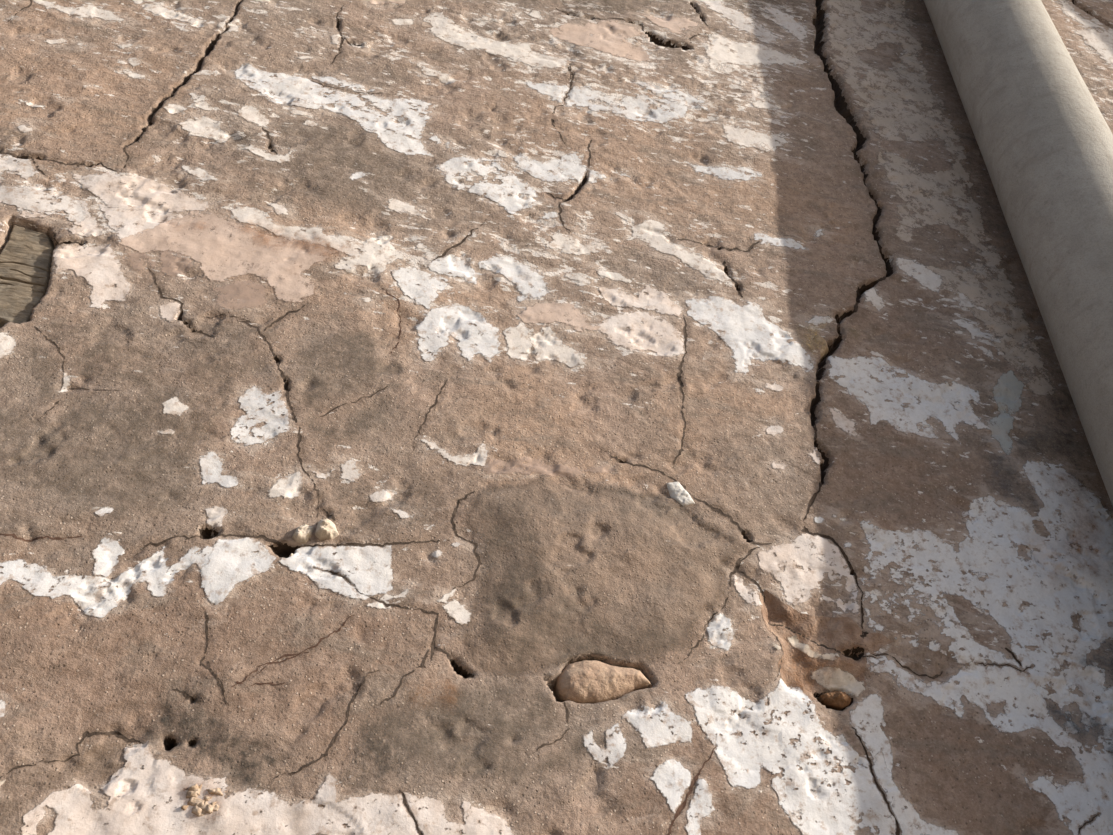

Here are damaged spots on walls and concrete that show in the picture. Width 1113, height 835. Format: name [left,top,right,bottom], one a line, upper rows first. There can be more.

crack [0,0,243,176]
peeling [0,154,814,374]
peeling [235,61,629,255]
crack [547,61,592,231]
crack [601,0,943,681]
peeling [826,0,1057,455]
crack [0,731,144,779]
peeling [0,506,413,618]
peeling [21,741,513,835]
crack [128,268,482,778]
peeling [583,458,1113,835]
crack [975,648,1031,672]